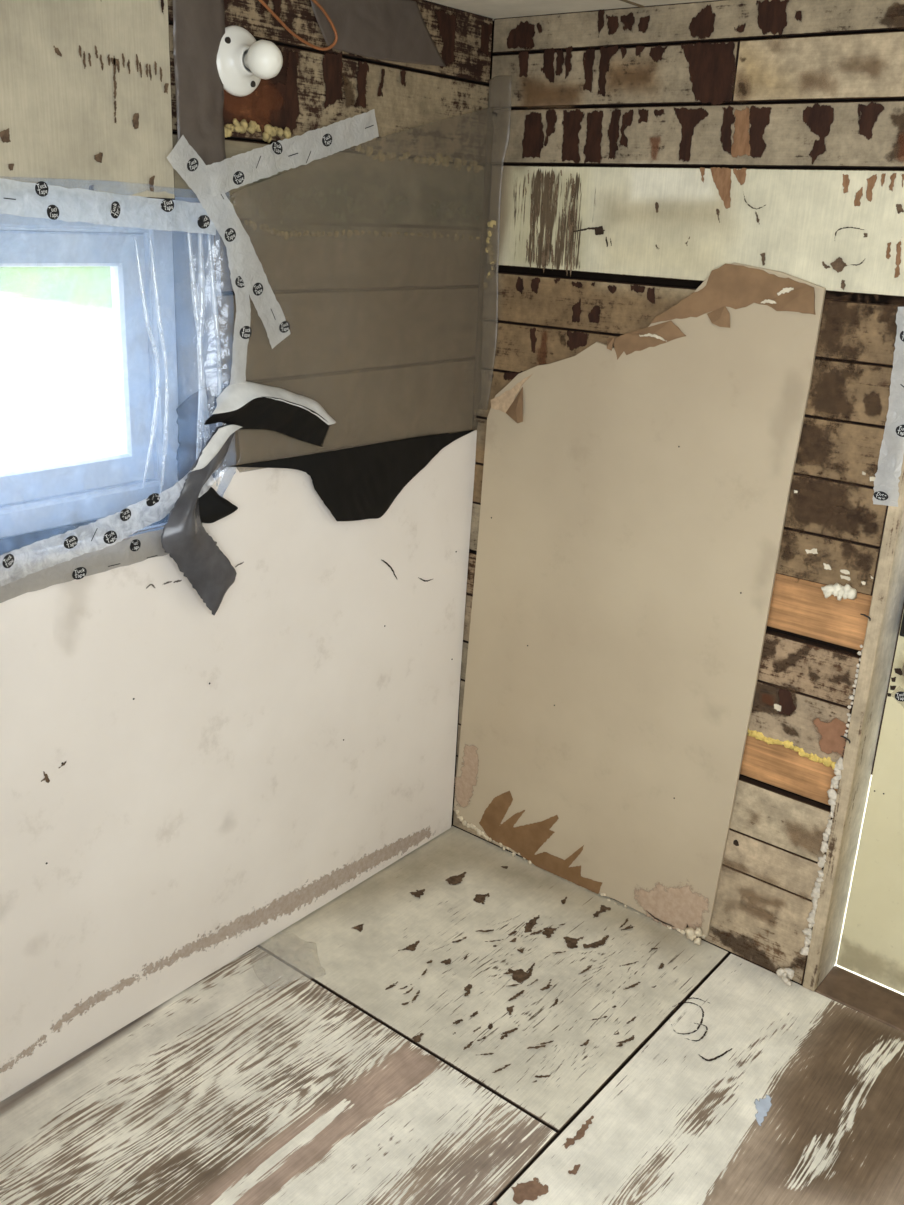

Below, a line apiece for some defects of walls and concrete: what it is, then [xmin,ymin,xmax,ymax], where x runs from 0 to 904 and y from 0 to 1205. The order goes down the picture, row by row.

peeling [79,45,169,123]
peeling [266,51,299,131]
peeling [322,51,385,109]
peeling [507,0,802,365]
peeling [803,103,834,165]
peeling [842,101,904,214]
peeling [822,257,847,290]
peeling [886,241,901,278]
peeling [445,872,466,885]
peeling [385,893,640,1005]
peeling [453,963,558,1055]
peeling [670,997,732,1061]